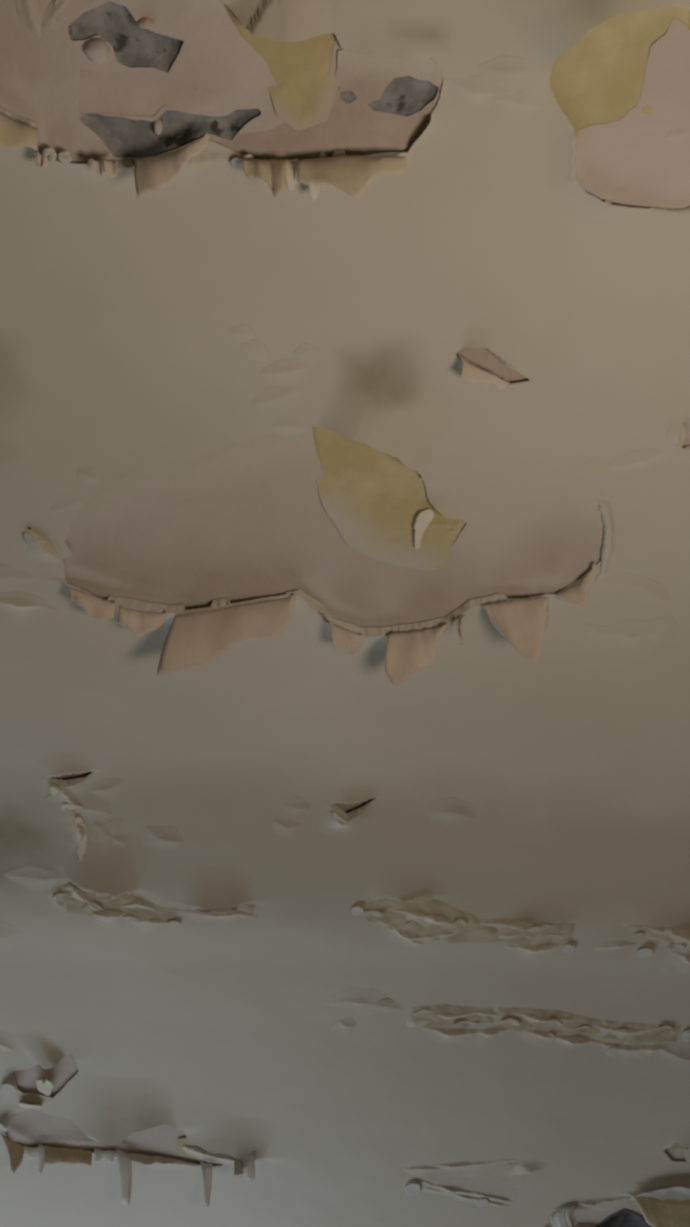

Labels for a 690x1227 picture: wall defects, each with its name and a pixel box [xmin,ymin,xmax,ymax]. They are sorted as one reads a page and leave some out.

peeling [0,0,473,201]
peeling [520,0,690,234]
peeling [448,339,540,392]
peeling [29,403,632,688]
peeling [325,794,384,820]
peeling [3,863,258,935]
peeling [351,891,575,962]
peeling [593,924,690,977]
peeling [324,988,690,1072]
peeling [0,1048,271,1209]
peeling [548,1186,690,1227]